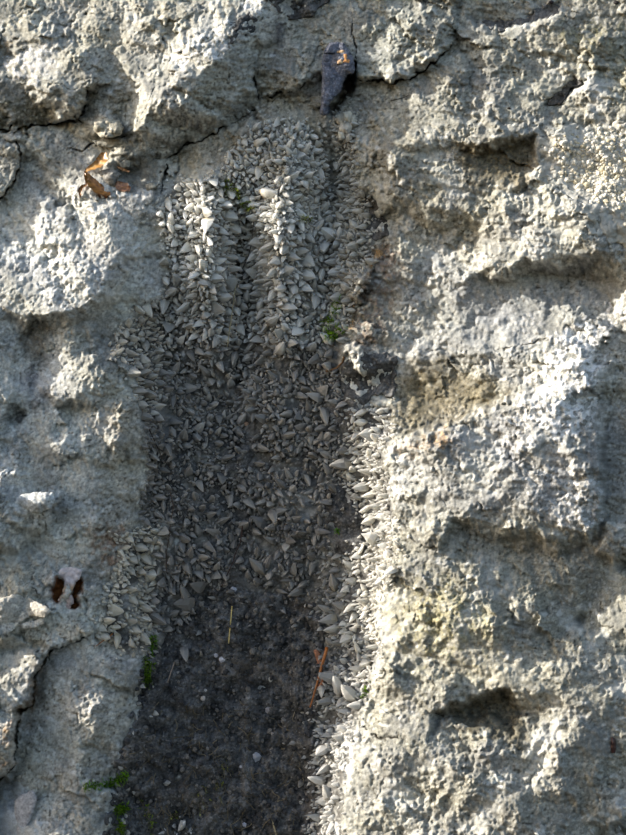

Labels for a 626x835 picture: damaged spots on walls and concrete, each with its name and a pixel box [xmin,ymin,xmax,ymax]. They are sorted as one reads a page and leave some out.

crack [0,637,84,781]